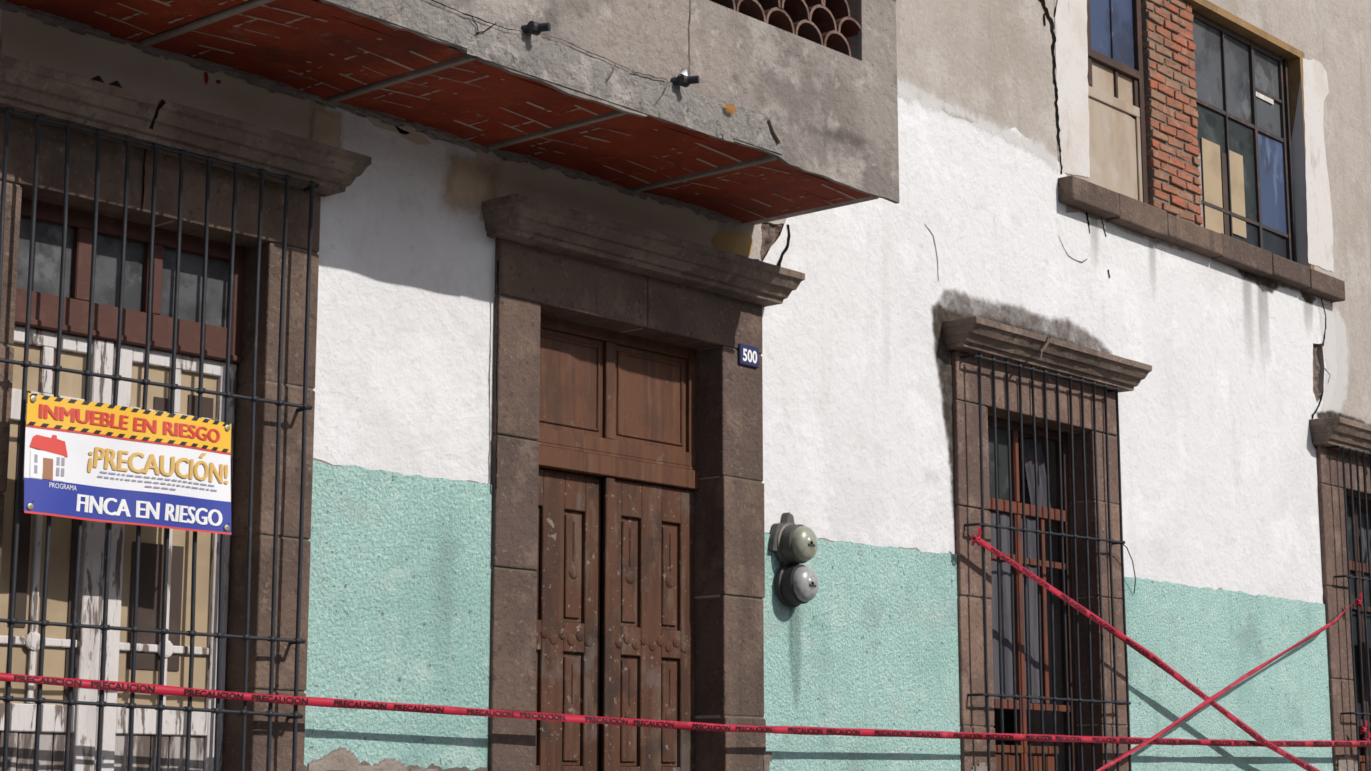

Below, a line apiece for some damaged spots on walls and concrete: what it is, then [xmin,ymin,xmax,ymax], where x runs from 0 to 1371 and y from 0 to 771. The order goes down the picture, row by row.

crack [141,99,166,212]
crack [1040,0,1063,174]